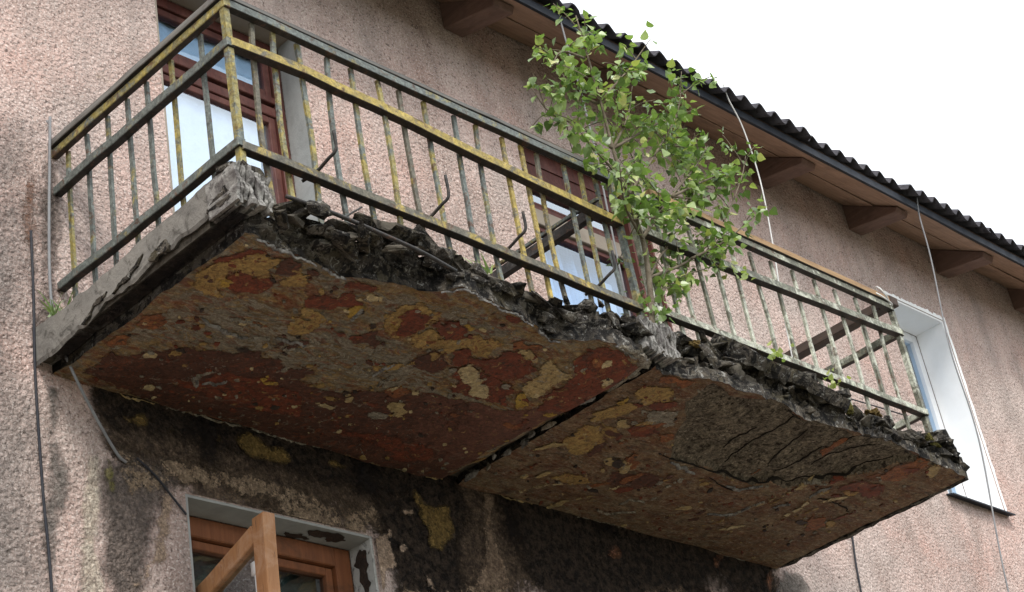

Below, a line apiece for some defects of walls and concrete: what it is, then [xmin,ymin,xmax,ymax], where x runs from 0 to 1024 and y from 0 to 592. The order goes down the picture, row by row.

peeling [81,159,654,479]
peeling [119,450,407,592]
water stain [81,386,810,592]
spalling [494,331,970,559]
crack [662,416,893,512]